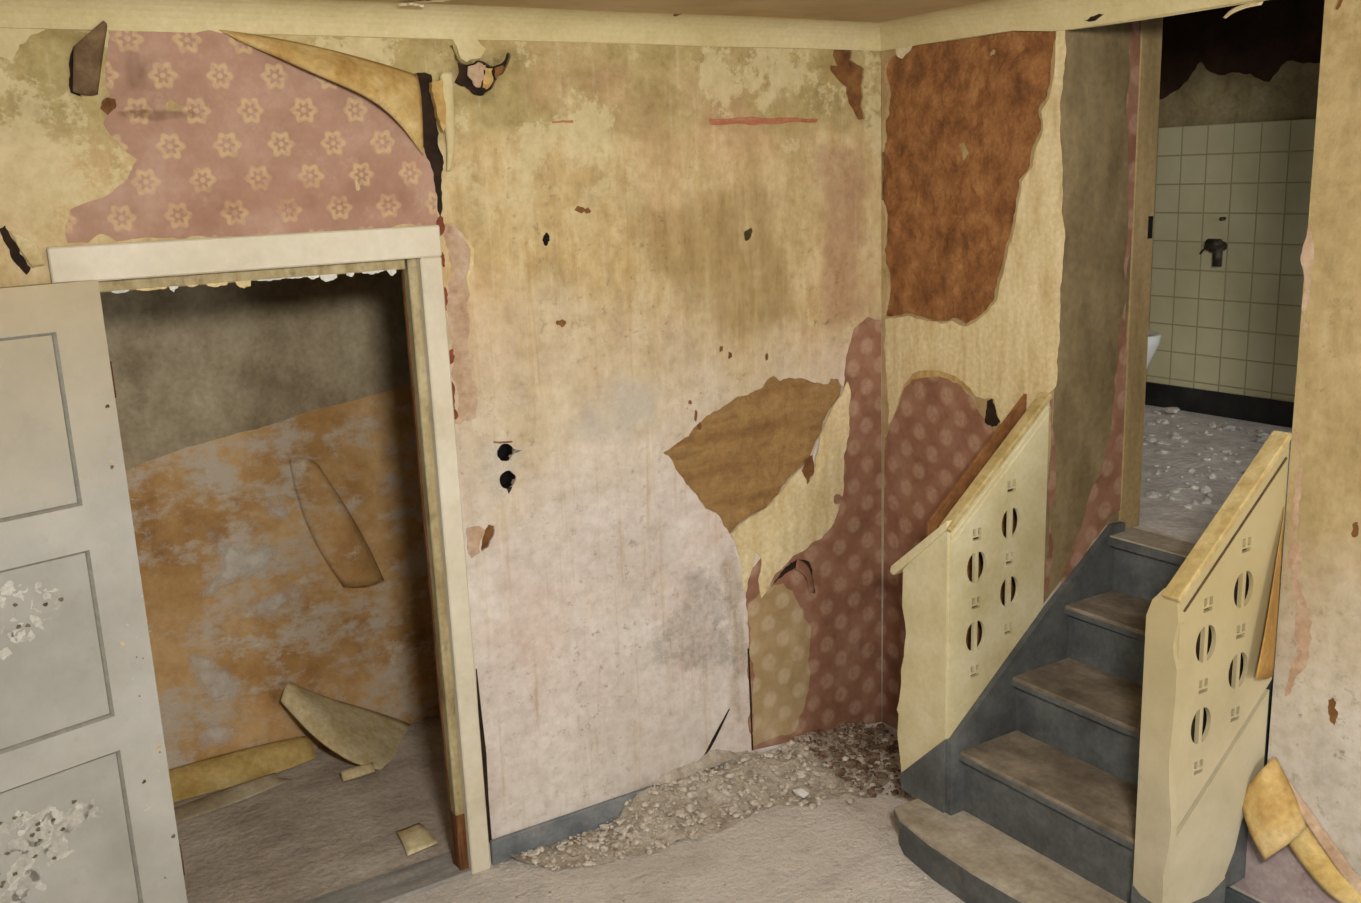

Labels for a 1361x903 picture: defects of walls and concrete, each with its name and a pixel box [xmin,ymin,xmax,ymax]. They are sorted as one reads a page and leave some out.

flaking render [1159,0,1325,99]
flaking render [883,30,1066,424]
flaking render [663,376,851,598]
peeling [0,580,64,661]
peeling [0,799,103,903]